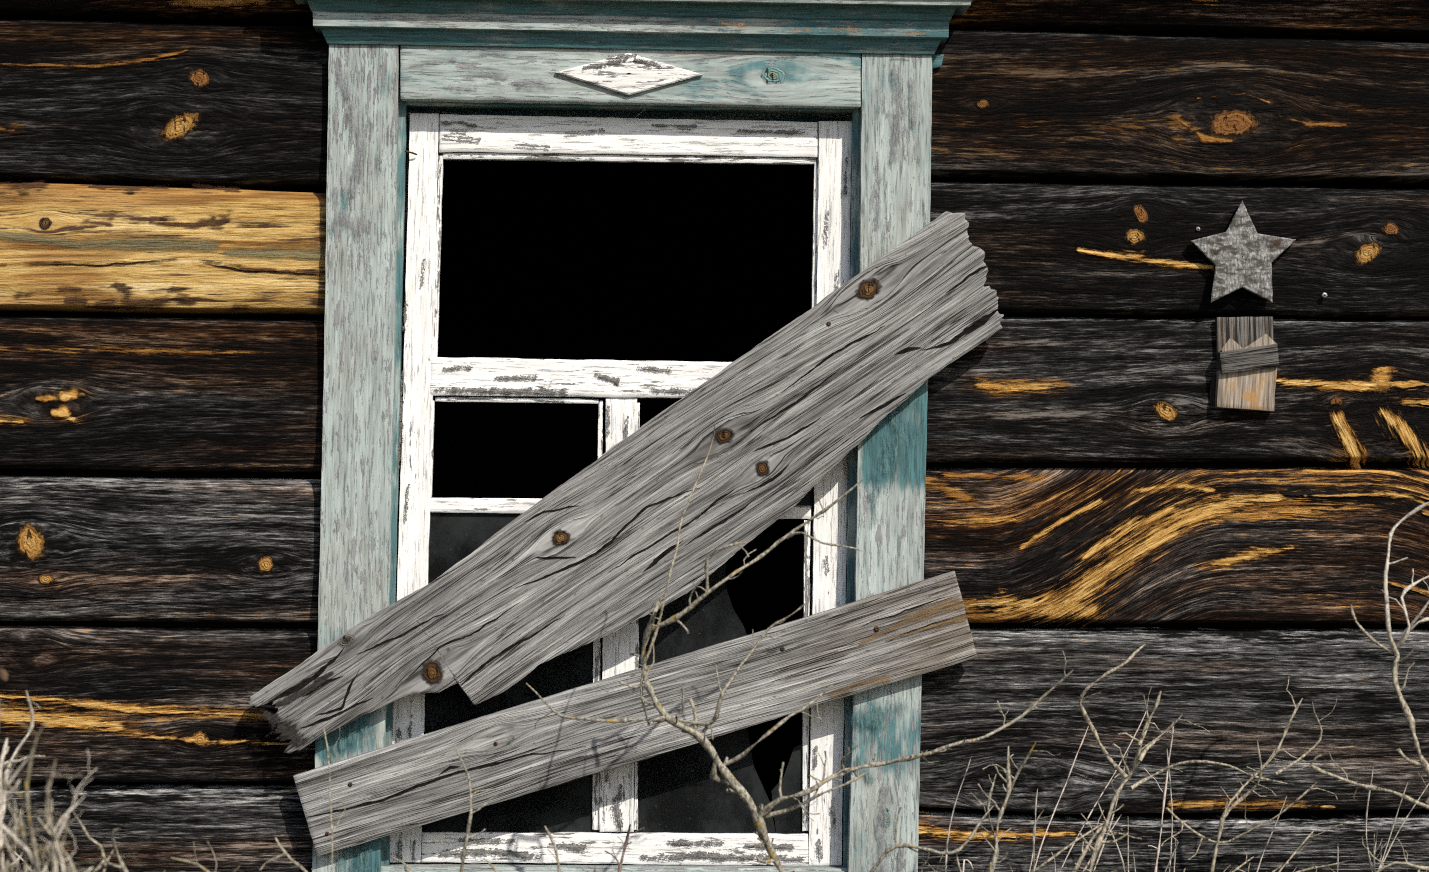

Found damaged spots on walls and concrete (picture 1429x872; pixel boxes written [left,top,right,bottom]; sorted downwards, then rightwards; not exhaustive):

peeling [441,120,481,141]
crack [946,264,989,293]
crack [268,307,1000,728]
peeling [640,797,836,862]
peeling [439,837,591,861]